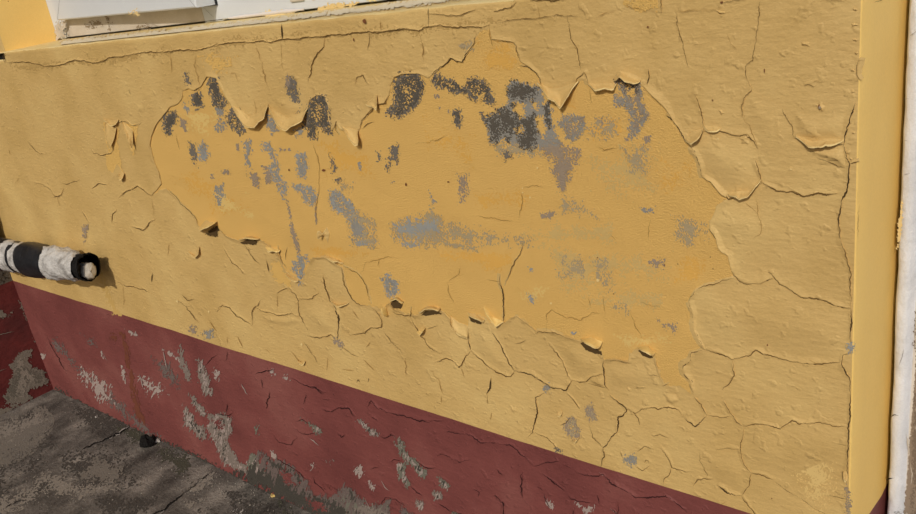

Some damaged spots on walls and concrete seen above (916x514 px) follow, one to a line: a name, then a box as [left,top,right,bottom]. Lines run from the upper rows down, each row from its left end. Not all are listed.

crack [3,0,591,99]
peeling [795,135,844,148]
peeling [0,271,13,285]
crack [16,178,197,231]
peeling [103,28,761,394]
crack [178,0,859,514]
flaking render [0,341,51,415]
flaking render [150,344,451,514]